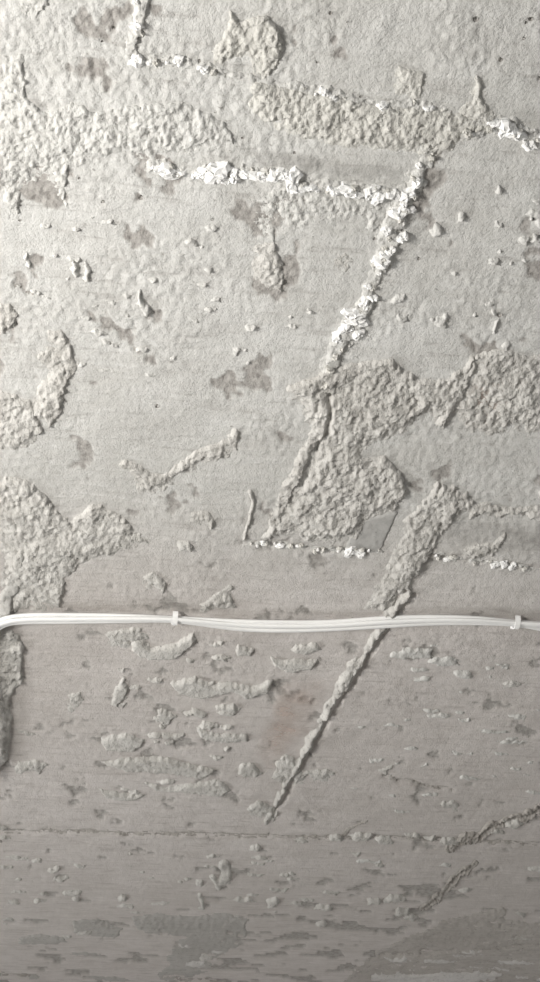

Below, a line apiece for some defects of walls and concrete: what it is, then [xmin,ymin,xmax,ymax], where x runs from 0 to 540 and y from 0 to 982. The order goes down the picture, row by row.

spalling [199,584,236,614]
peeling [106,627,197,663]
peeling [209,641,255,662]
peeling [271,642,322,673]
peeling [390,644,473,682]
peeling [99,668,273,801]
crack [384,774,454,791]
crack [0,802,540,912]
peeling [329,832,394,868]
peeling [18,919,123,956]
peeling [116,893,249,982]
peeling [344,894,540,982]